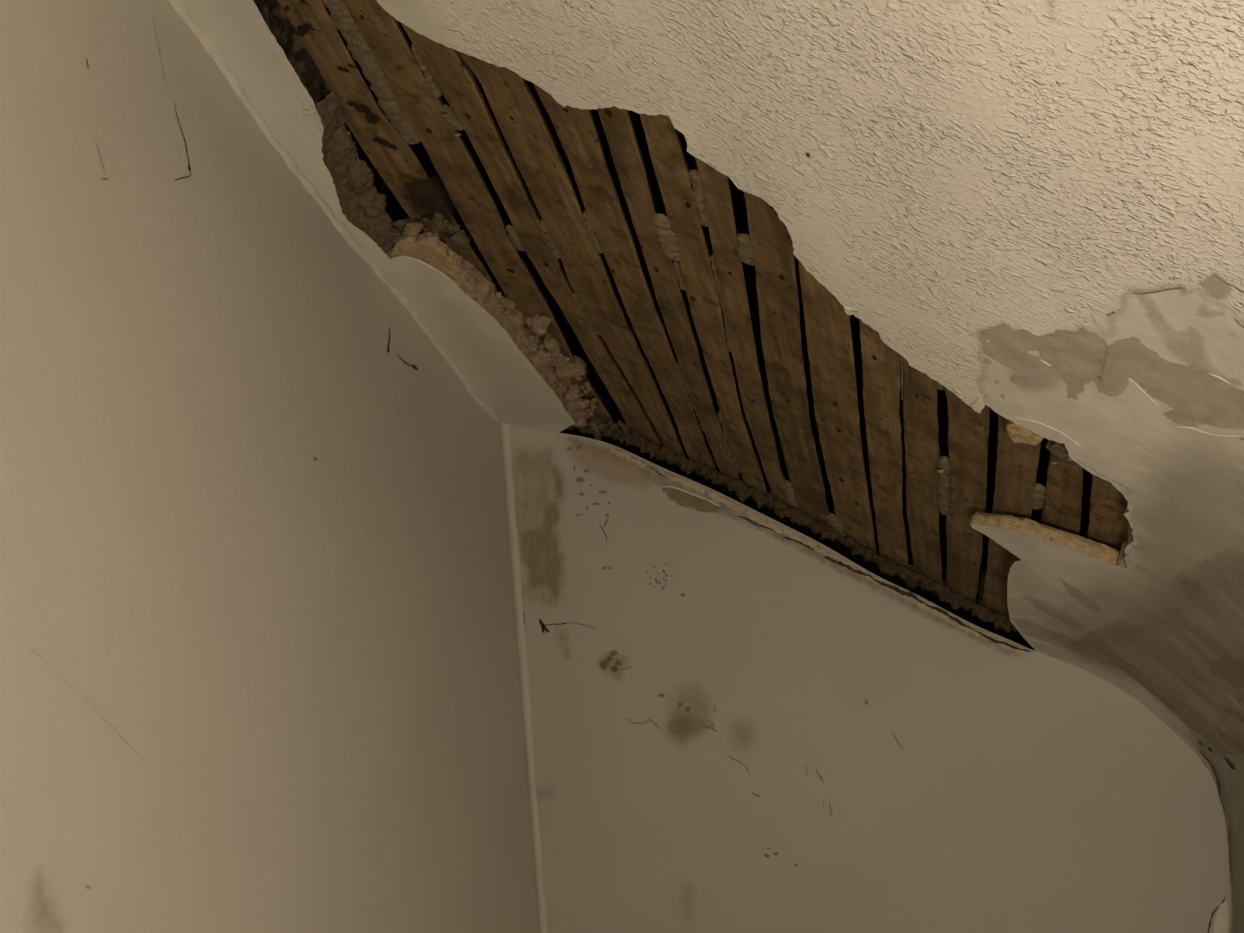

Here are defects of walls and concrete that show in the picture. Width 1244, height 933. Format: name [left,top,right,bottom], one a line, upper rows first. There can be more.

flaking render [253,0,1244,933]
water stain [1072,481,1244,770]